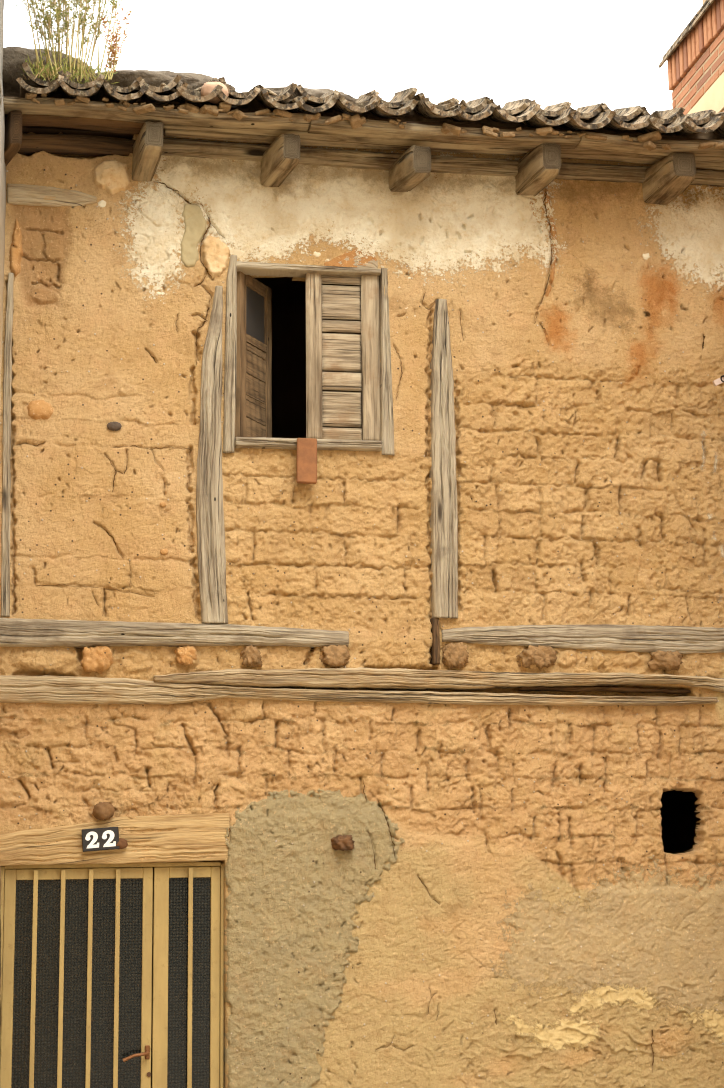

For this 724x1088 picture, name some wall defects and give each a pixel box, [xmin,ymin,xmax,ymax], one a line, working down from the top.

flaking render [98,155,567,307]
crack [534,189,553,342]
crack [108,445,191,492]
crack [38,523,155,616]